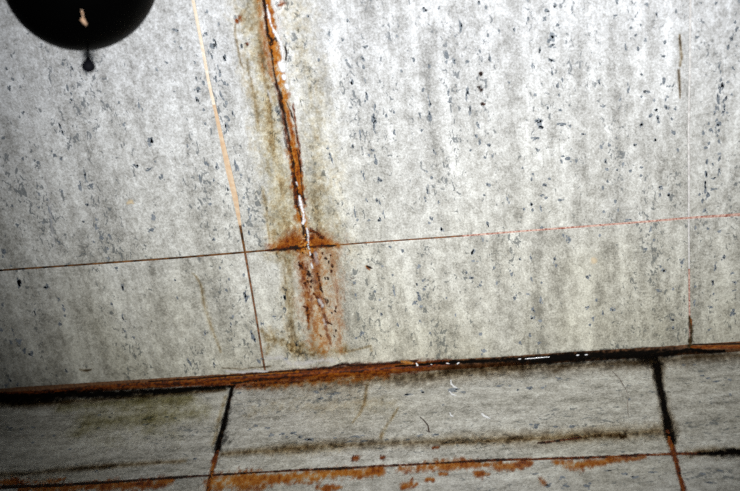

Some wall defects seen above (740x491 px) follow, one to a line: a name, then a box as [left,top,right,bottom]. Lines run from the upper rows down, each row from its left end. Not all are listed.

damp [267,0,289,89]
crack [263,0,317,247]
corrosion [258,0,341,352]
corrosion [0,359,461,394]
corrosion [0,430,699,491]